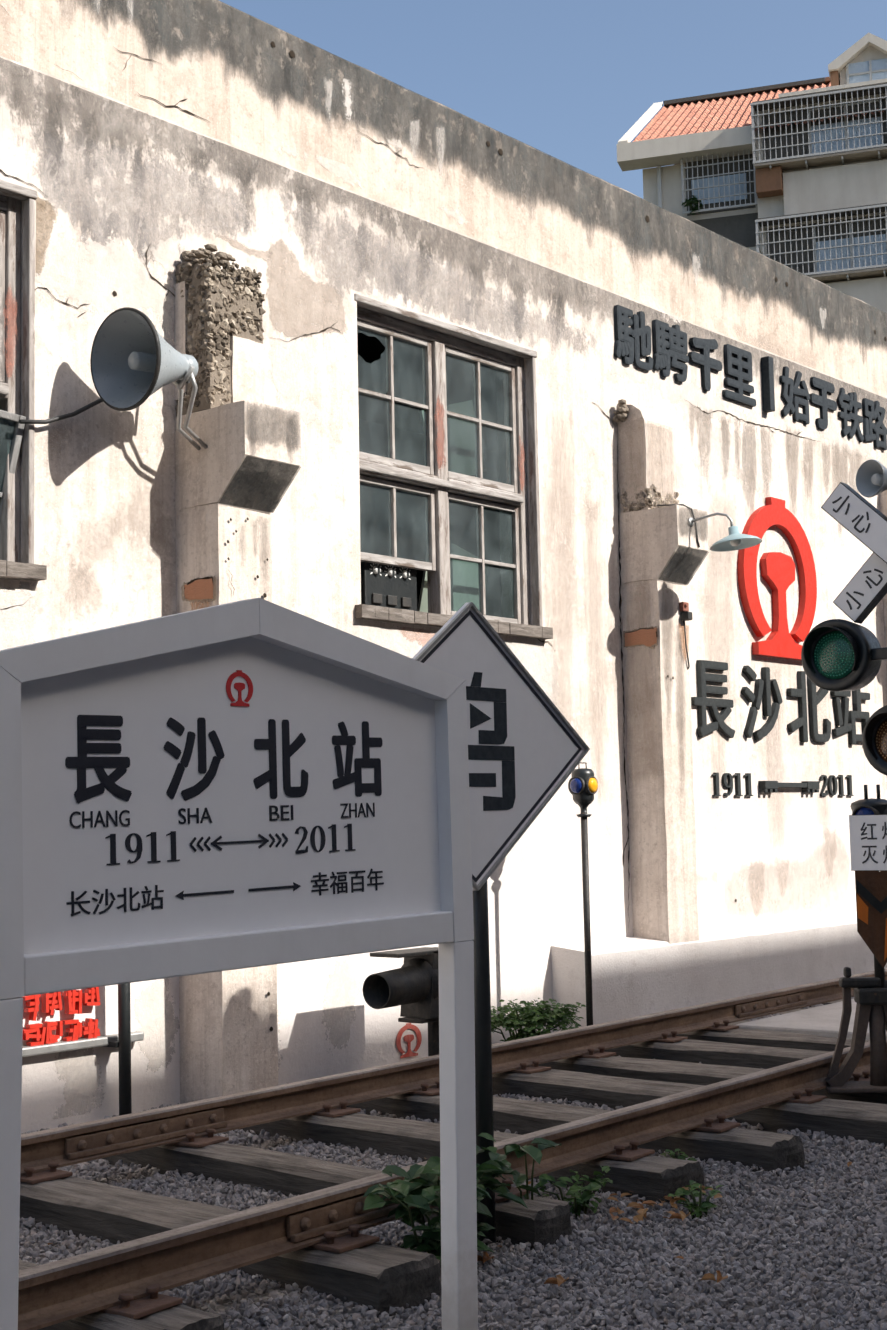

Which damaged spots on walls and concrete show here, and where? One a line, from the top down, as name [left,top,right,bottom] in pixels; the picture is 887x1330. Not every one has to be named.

crack [118,50,208,121]
water stain [6,0,887,424]
crack [143,243,175,301]
crack [35,287,90,317]
crack [686,400,816,441]
water stain [219,404,301,513]
flaking render [181,576,216,602]
flaking render [623,626,658,649]